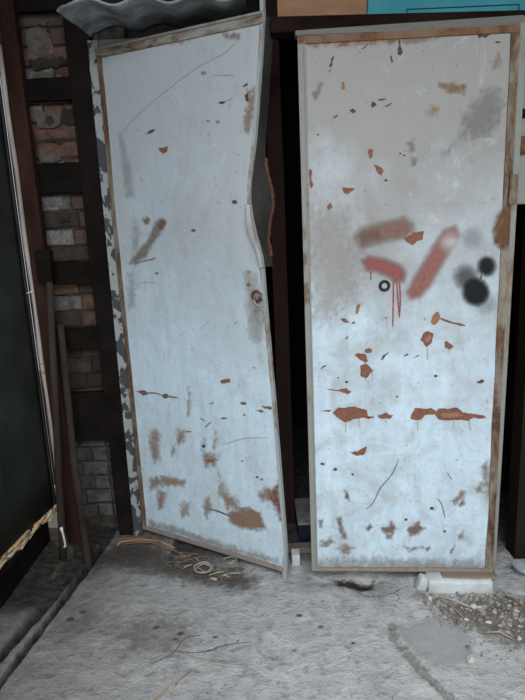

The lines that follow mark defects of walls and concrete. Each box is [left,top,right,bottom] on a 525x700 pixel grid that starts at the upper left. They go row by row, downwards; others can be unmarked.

flaking render [26,20,68,79]
flaking render [33,108,75,145]
flaking render [38,153,62,163]
rust [204,484,265,530]
rust [258,485,281,520]